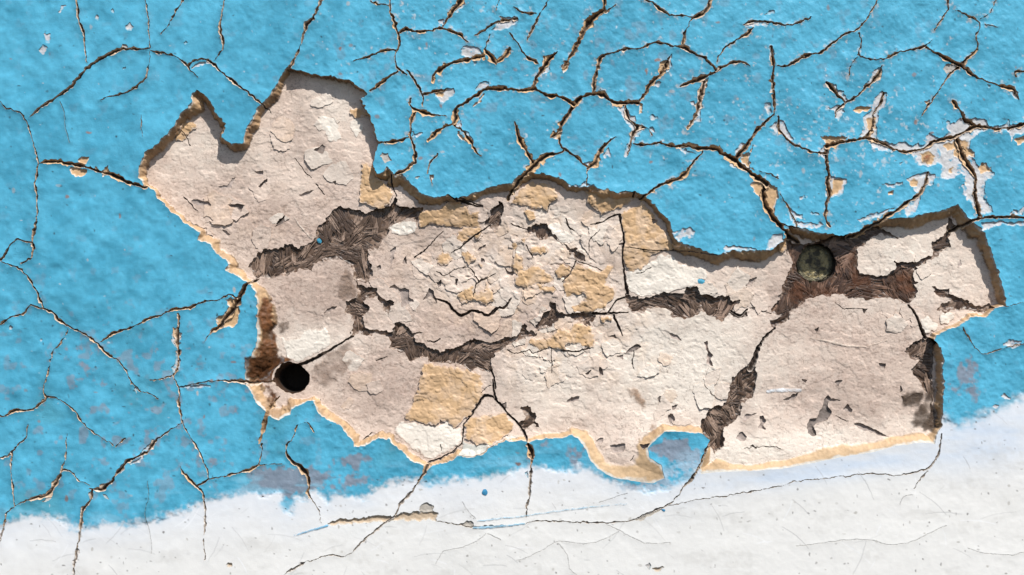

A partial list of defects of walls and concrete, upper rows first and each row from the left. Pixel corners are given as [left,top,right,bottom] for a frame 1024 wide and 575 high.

crack [353,0,1024,244]
crack [0,0,323,575]
rust [245,297,290,402]
peeling [82,67,1006,528]
crack [963,327,1023,354]
crack [284,462,430,575]
crack [435,433,947,575]
crack [968,548,1024,556]